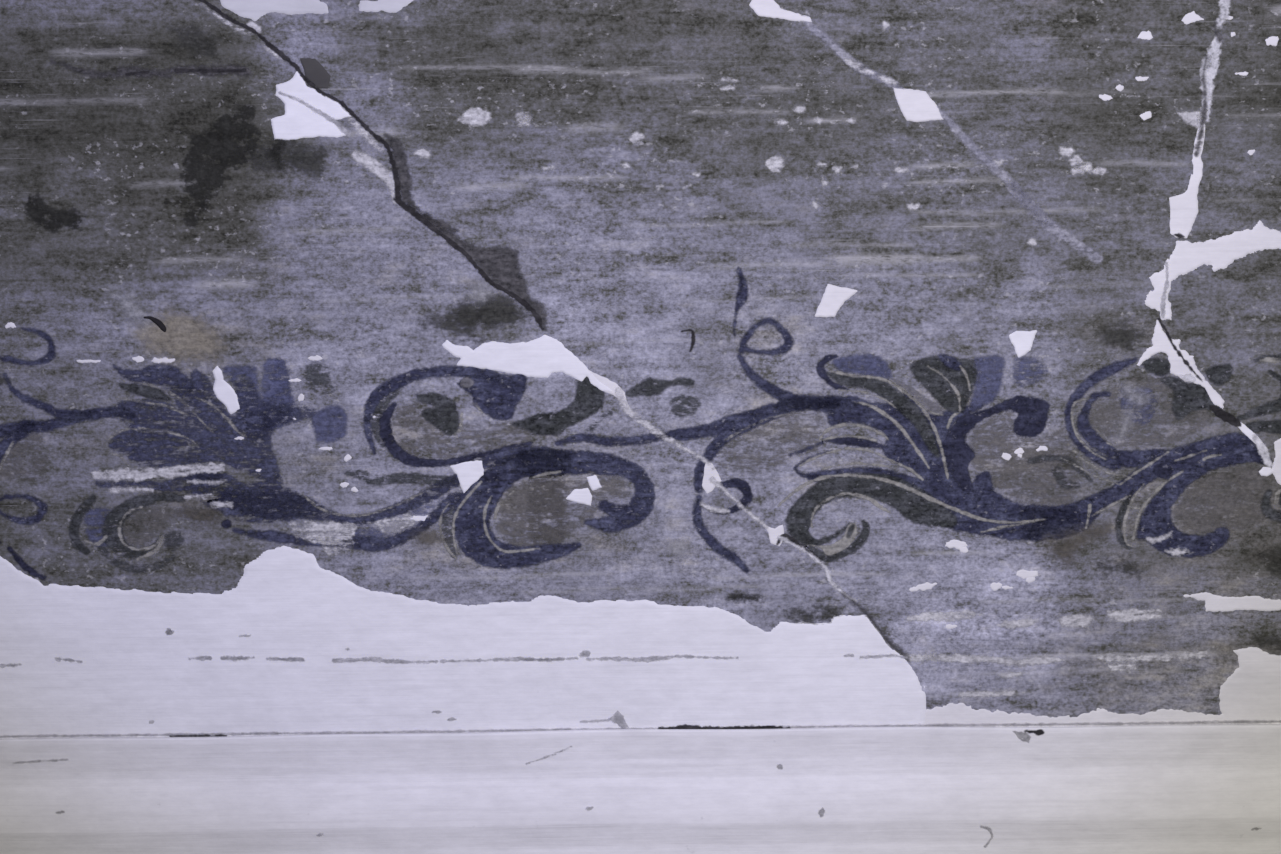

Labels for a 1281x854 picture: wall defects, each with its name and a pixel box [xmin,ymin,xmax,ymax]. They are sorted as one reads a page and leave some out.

peeling [220,0,329,21]
leakage [26,194,82,232]
leakage [180,105,326,227]
crack [51,0,546,330]
peeling [271,71,352,140]
crack [1169,0,1230,238]
peeling [442,335,613,392]
crack [1137,318,1273,467]
peeling [566,475,602,506]
crack [587,370,909,661]
crack [189,651,738,664]
peeling [0,514,1281,738]